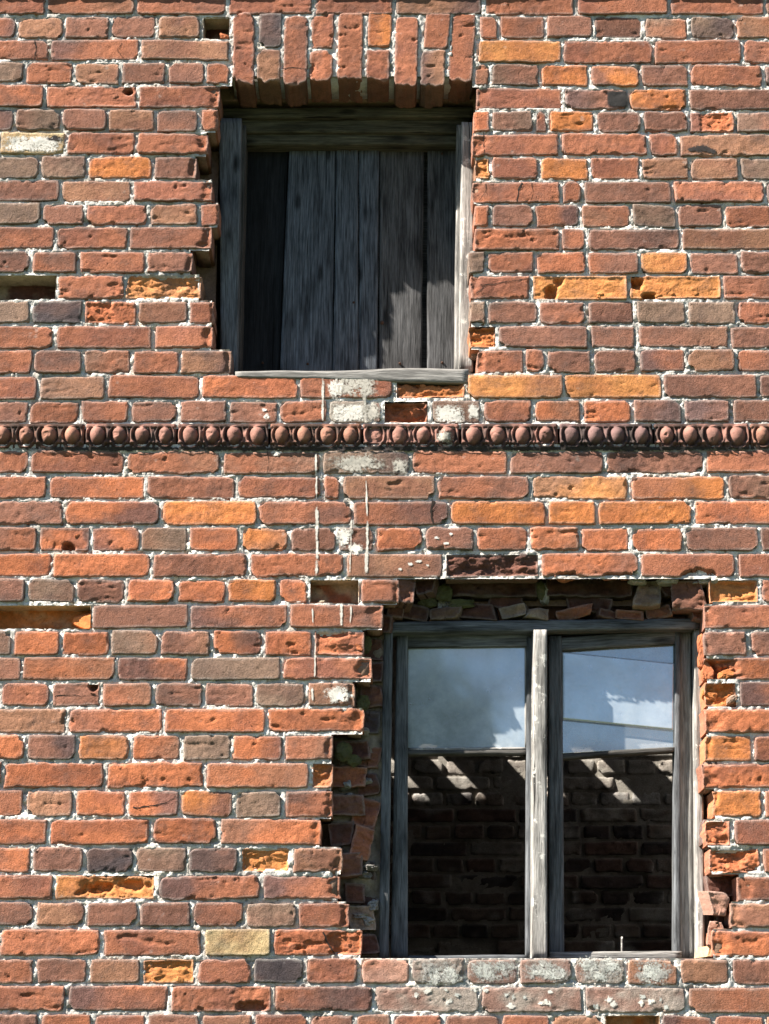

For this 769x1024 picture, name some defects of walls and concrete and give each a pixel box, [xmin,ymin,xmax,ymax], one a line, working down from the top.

spalling [85,276,206,325]
spalling [533,276,721,300]
damp [321,378,380,422]
damp [4,403,769,573]
spalling [274,553,769,958]
spalling [242,848,289,872]
spalling [0,875,155,900]
spalling [143,959,271,1012]